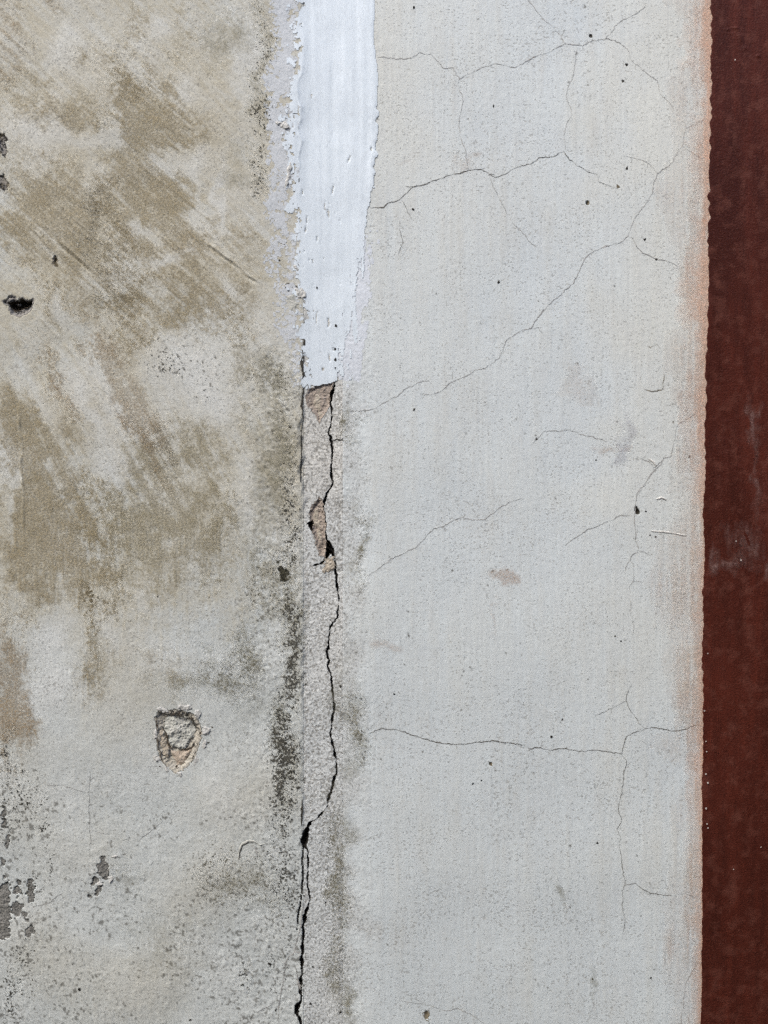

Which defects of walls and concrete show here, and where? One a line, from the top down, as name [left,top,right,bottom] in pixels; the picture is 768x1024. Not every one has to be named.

hole [1,295,34,317]
leakage [0,386,222,603]
mould [247,6,277,212]
crack [294,321,306,481]
spalling [306,382,335,423]
spalling [308,497,335,573]
crack [358,3,704,412]
leakage [0,643,55,877]
flaking render [152,704,213,768]
leakage [186,457,309,999]
crack [259,346,519,1024]
crack [369,694,696,932]